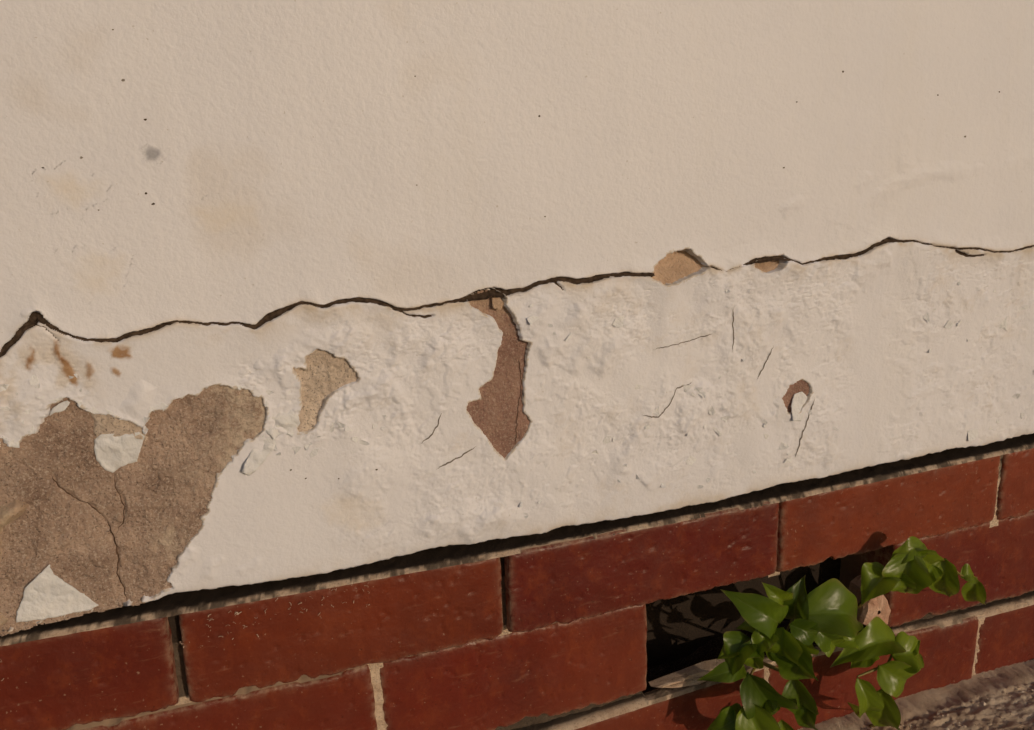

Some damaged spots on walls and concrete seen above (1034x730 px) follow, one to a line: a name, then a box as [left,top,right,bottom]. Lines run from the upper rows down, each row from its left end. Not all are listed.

spalling [651,251,704,284]
crack [710,237,1034,272]
crack [0,272,655,357]
crack [656,312,734,350]
peeling [466,290,530,458]
peeling [782,380,813,421]
spalling [0,349,358,636]
spalling [642,634,724,694]